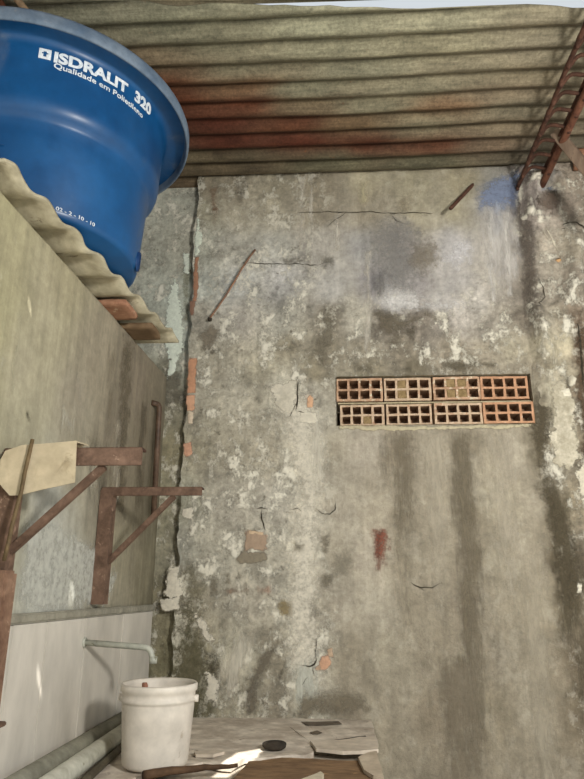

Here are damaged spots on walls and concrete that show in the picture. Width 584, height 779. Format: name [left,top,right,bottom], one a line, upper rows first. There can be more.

peeling [165,218,203,424]
crack [325,211,433,227]
water stain [365,223,437,344]
water stain [443,362,493,370]
water stain [517,199,536,302]
spalling [536,191,560,214]
peeling [549,375,584,502]
spalling [237,530,268,564]
water stain [452,436,480,663]
water stain [528,392,584,630]